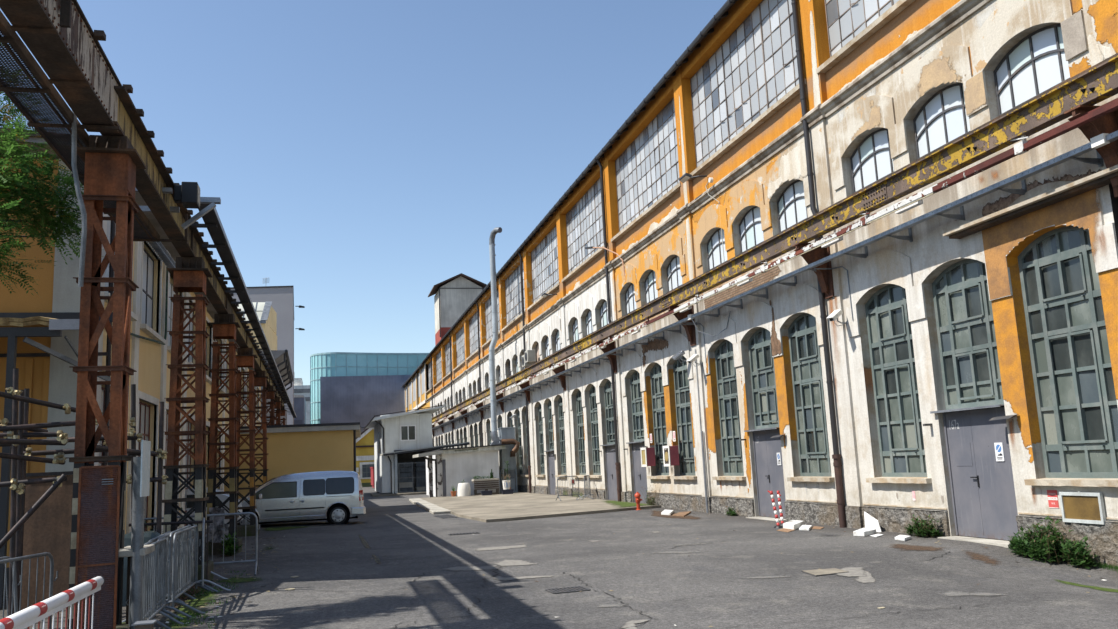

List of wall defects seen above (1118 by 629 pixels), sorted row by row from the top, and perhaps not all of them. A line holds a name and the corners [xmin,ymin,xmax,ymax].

peeling [1068,0,1118,78]
peeling [991,225,1083,463]
peeling [1098,268,1118,400]